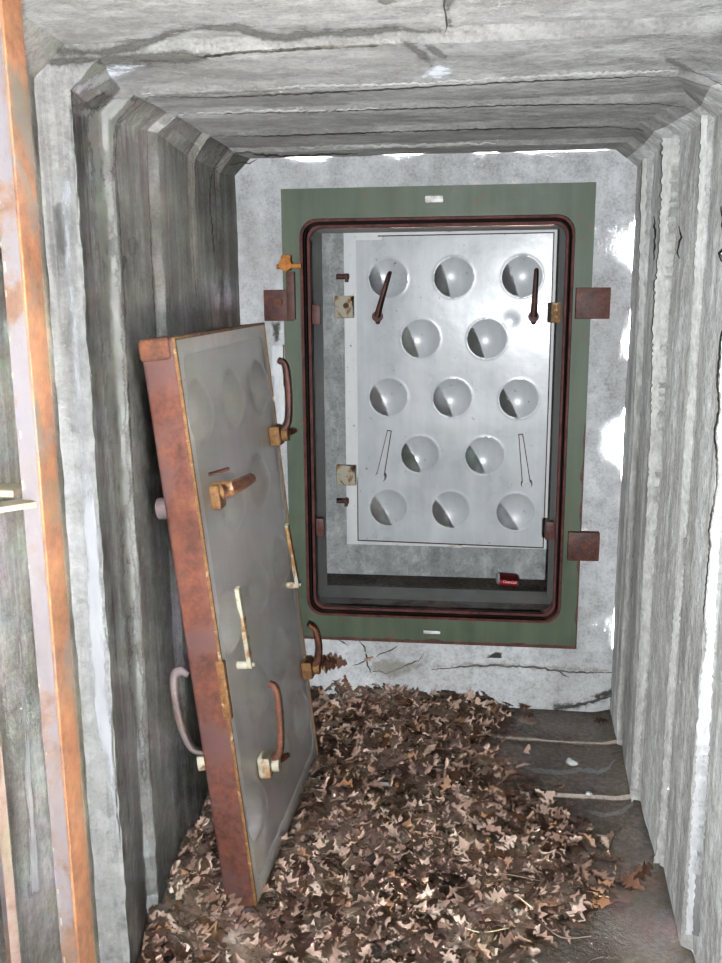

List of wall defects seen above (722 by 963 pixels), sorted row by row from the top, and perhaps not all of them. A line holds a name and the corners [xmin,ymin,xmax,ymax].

crack [441,0,449,32]
crack [115,75,685,814]